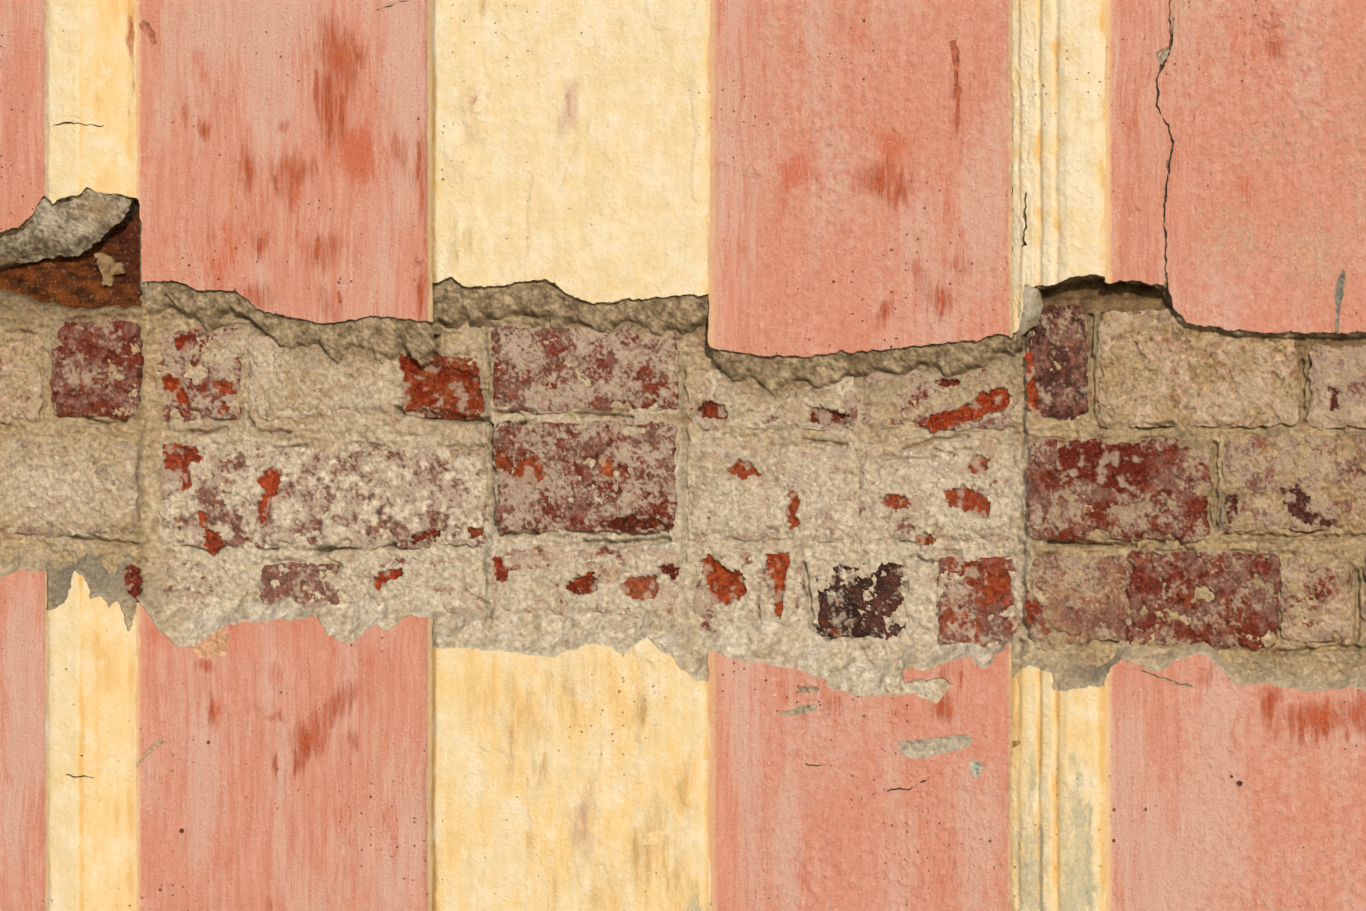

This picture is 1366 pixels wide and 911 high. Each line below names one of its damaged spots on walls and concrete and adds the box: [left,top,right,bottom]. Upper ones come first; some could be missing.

crack [1153,0,1185,288]
spalling [0,187,1366,716]